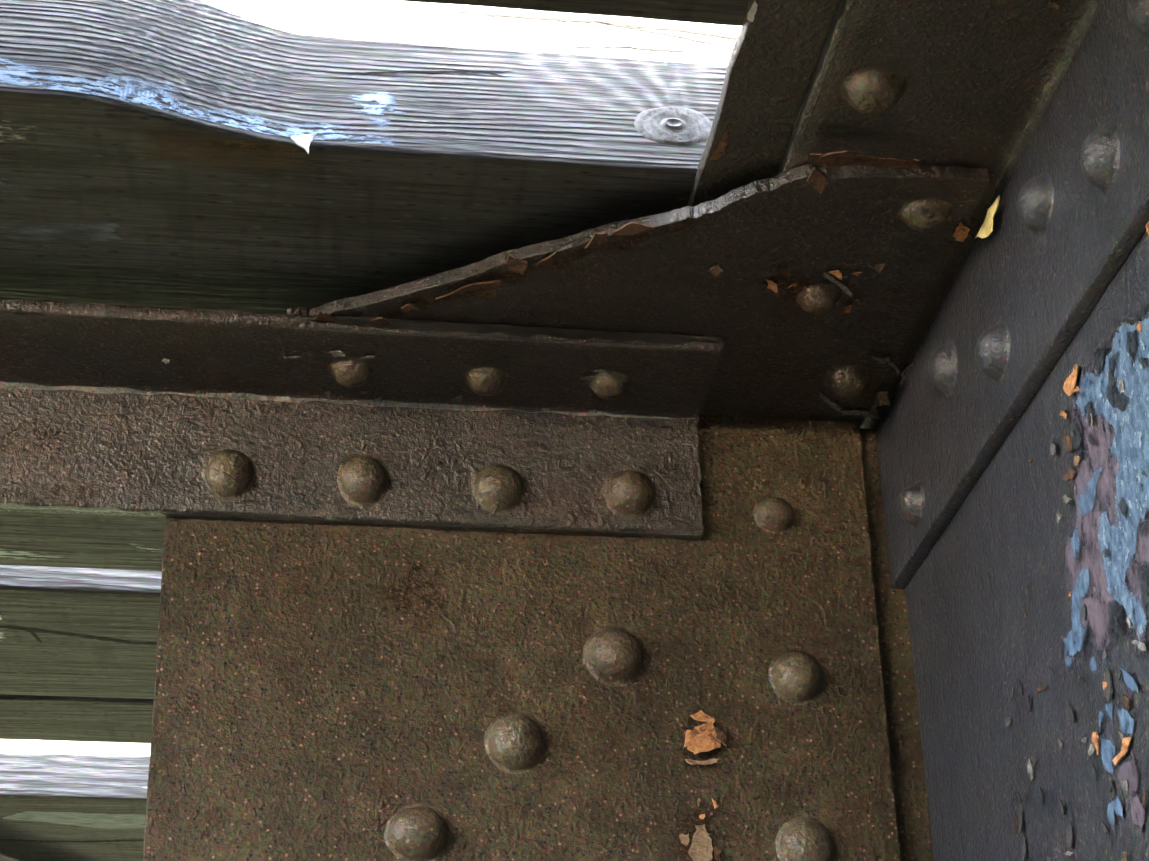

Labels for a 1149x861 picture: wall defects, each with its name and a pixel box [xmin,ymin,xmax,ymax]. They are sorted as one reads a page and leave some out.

rust [807,150,920,194]
rust [953,222,970,242]
rust [371,220,697,324]
peeling [1049,312,1149,832]
crack [0,626,157,645]